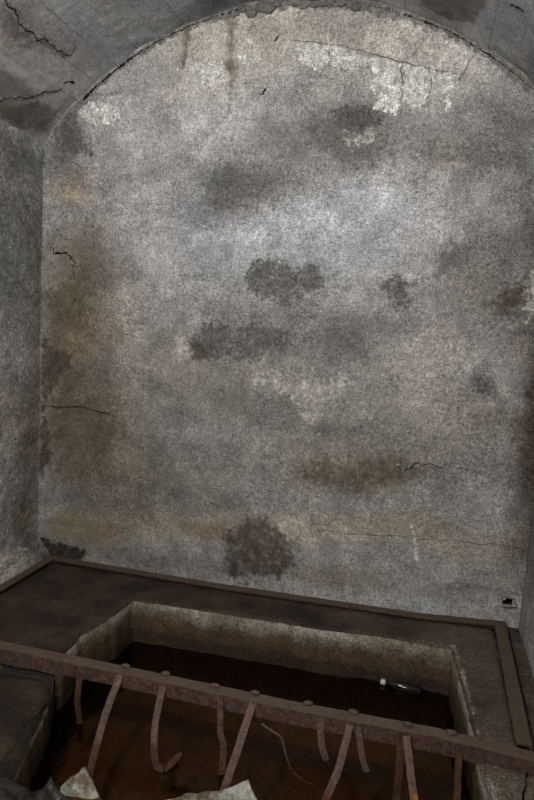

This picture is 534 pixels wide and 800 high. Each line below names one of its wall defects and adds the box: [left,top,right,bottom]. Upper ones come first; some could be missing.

crack [0,0,289,102]
crack [274,0,534,98]
water stain [245,258,324,306]
water stain [490,270,534,324]
water stain [169,322,378,425]
crack [49,405,111,414]
crack [396,461,483,474]
water stain [224,518,294,585]
crack [520,773,528,800]